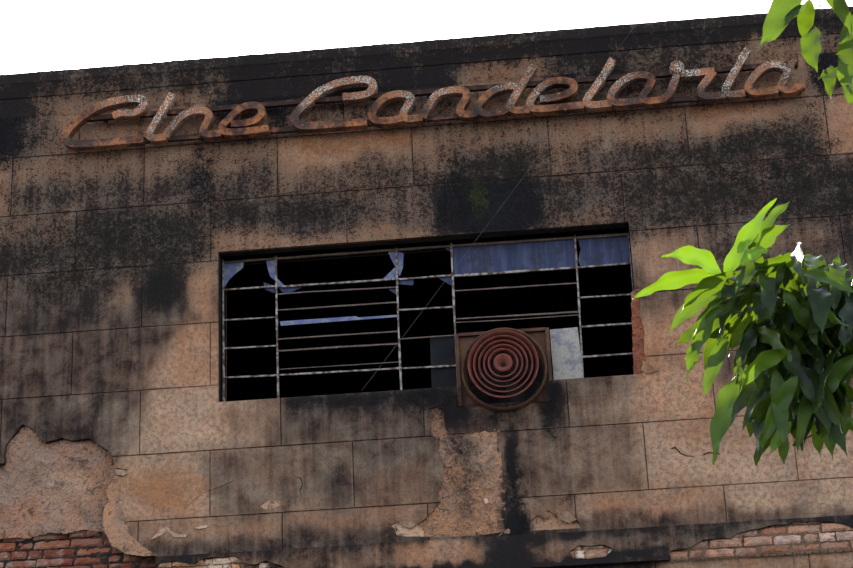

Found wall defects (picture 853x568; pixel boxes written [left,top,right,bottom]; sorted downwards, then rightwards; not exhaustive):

water stain [0,139,559,312]
corrosion [631,289,658,375]
flaking render [0,426,244,568]
peeling [261,500,281,509]
flaking render [392,407,510,537]
water stain [498,424,530,536]
flaking render [571,546,612,559]
flaking render [670,521,853,559]